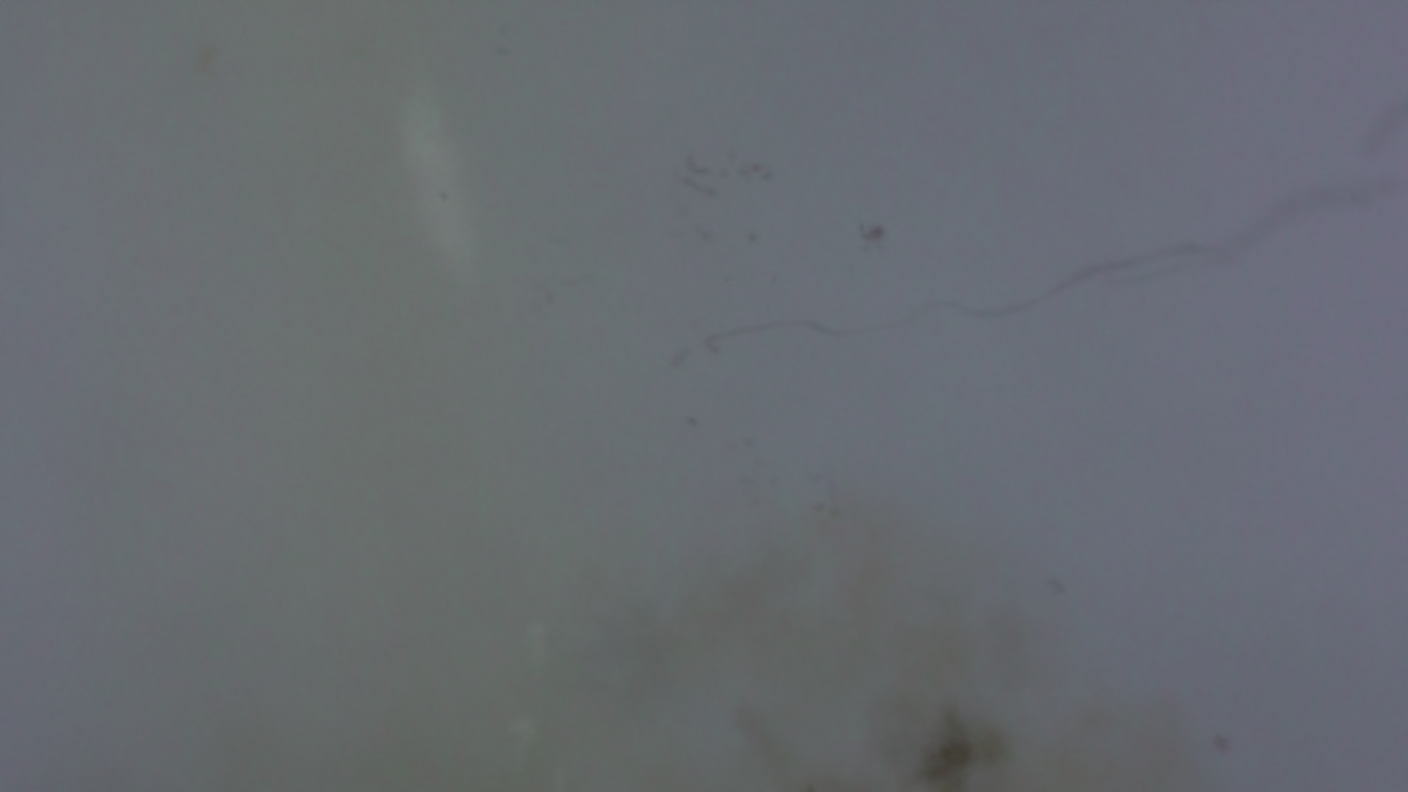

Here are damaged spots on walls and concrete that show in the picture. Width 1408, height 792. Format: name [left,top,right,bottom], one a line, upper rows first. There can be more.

leakage [821,653,1083,792]